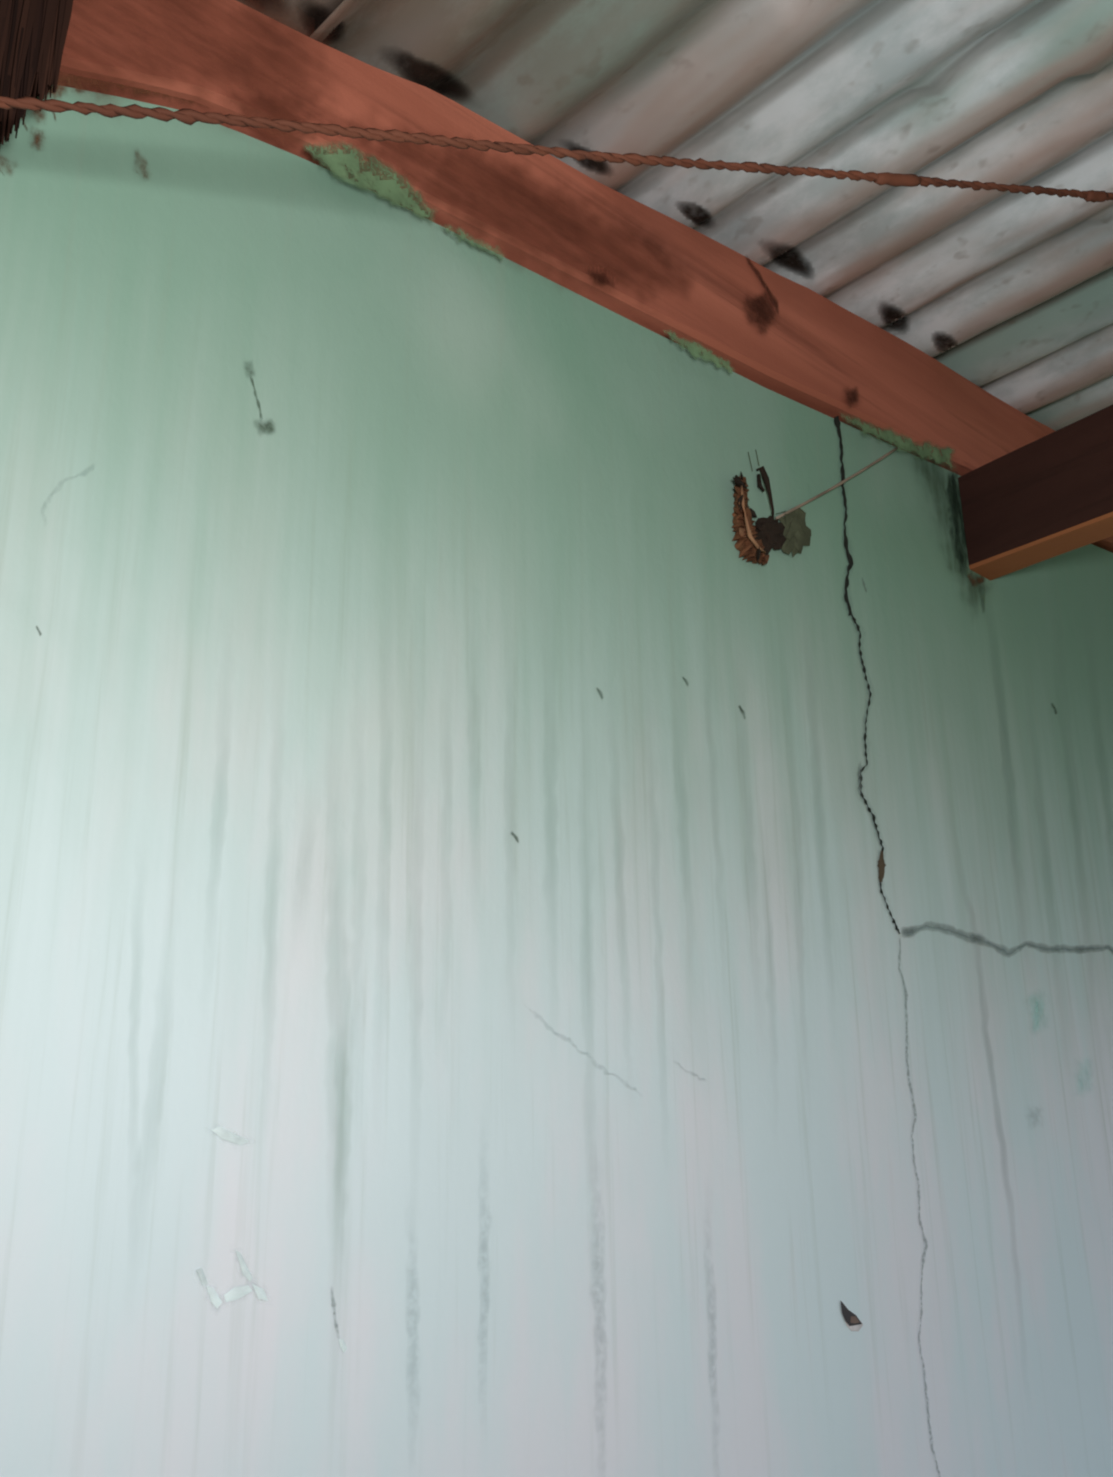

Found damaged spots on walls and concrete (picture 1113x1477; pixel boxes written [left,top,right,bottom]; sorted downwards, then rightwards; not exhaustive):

crack [834,416,900,934]